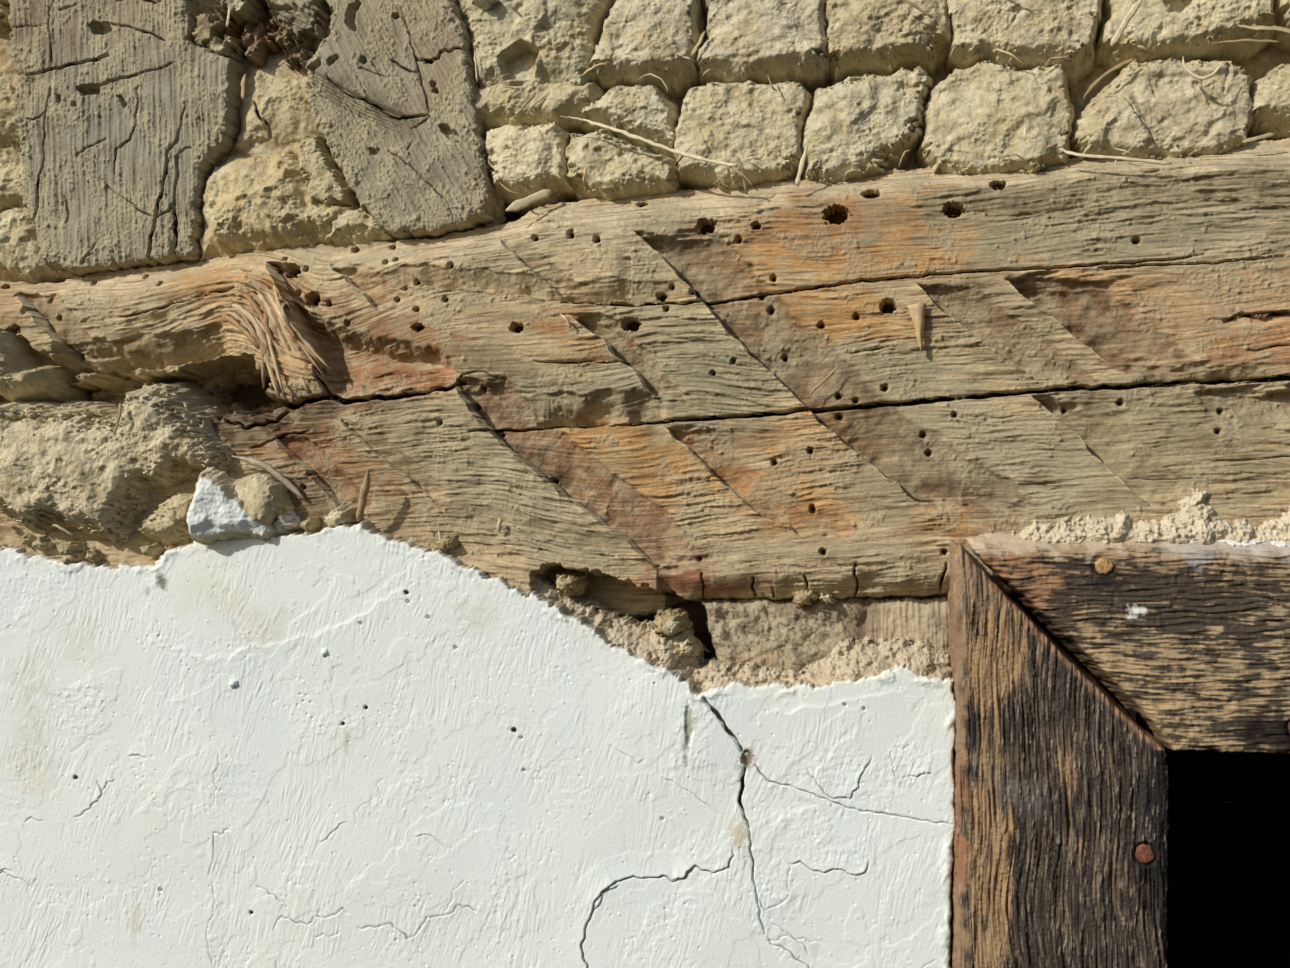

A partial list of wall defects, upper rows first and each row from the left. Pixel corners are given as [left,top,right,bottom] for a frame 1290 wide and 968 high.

spalling [186,467,295,548]
spalling [535,574,952,690]
crack [580,698,954,968]